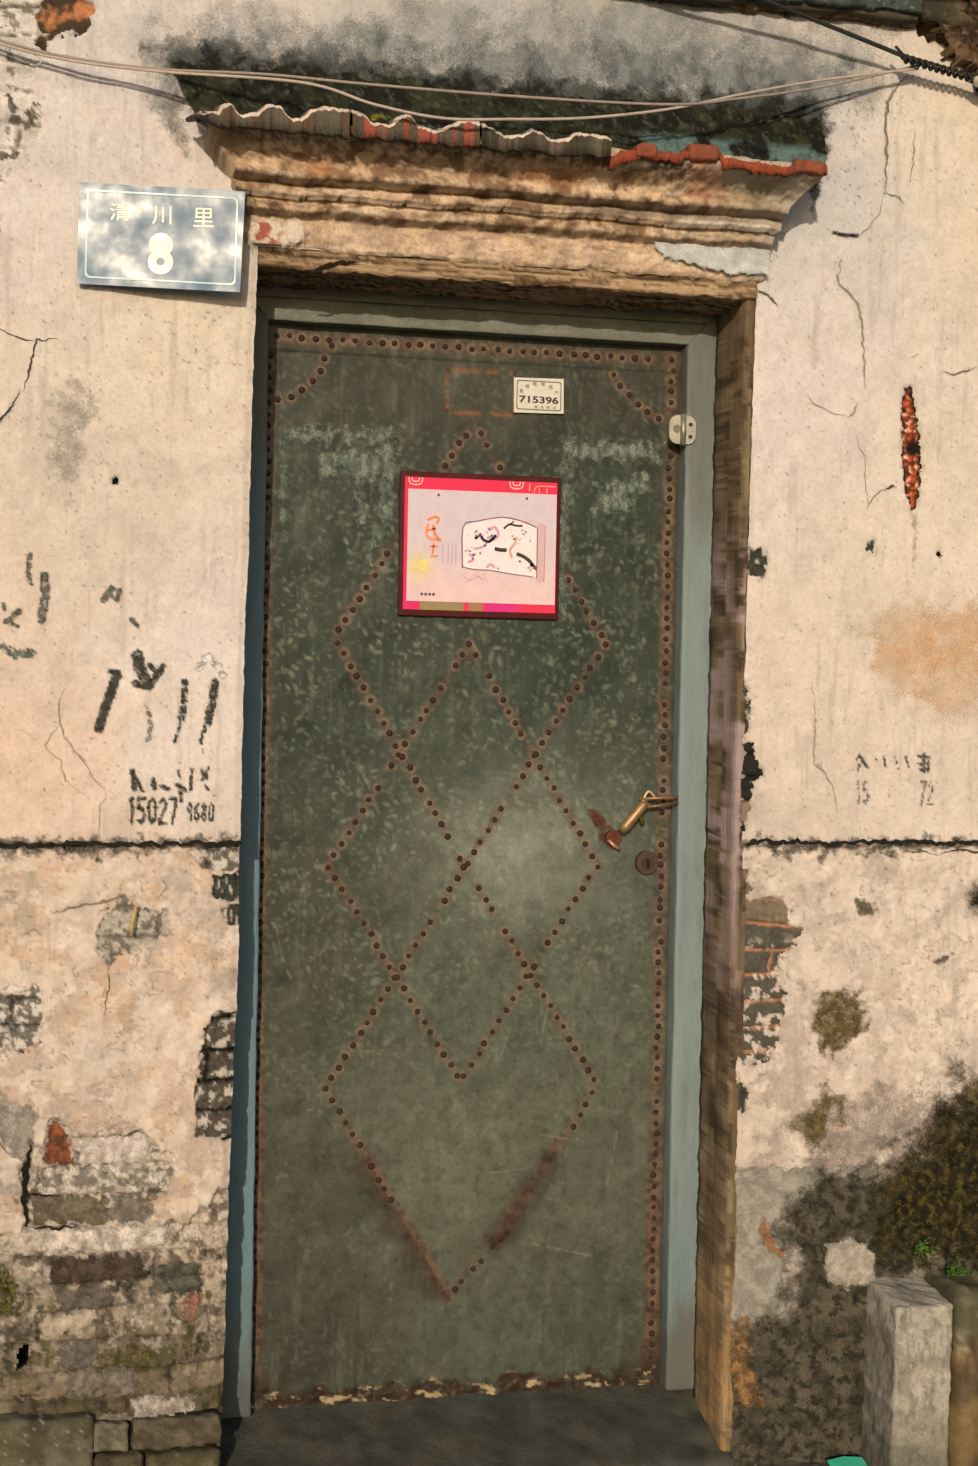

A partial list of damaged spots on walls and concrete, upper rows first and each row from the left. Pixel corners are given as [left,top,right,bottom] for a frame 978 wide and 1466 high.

flaking render [0,0,95,189]
damp [139,0,908,156]
crack [0,329,57,421]
crack [808,75,915,505]
spalling [901,386,922,547]
crack [741,684,978,863]
flaking render [0,983,43,1054]
flaking render [96,895,170,966]
peeling [194,1011,236,1140]
flaking render [740,869,804,1065]
flaking render [0,1091,229,1418]
damp [730,1082,928,1466]